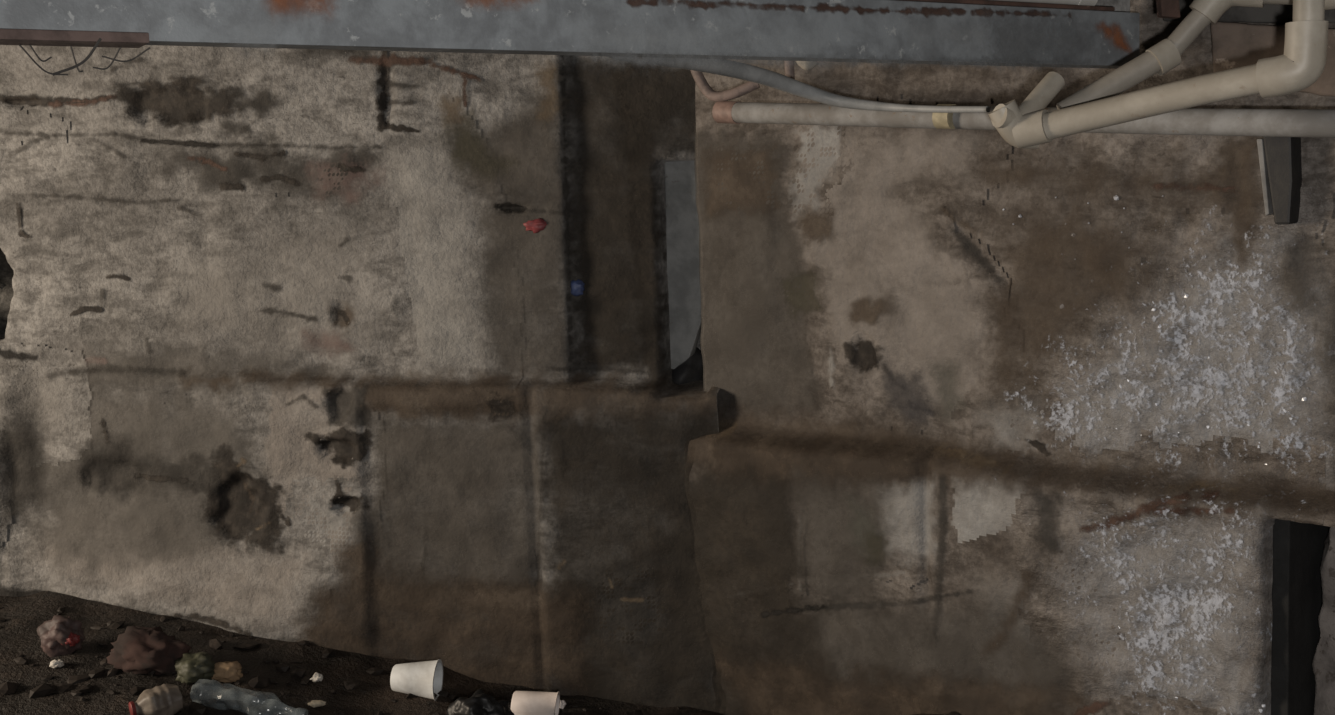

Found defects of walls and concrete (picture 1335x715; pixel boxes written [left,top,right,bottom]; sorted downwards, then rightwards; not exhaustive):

crack [17,132,59,152]
crack [106,51,419,158]
rust [627,0,1051,18]
leakage [0,95,572,563]
leakage [542,58,1335,715]
peeling [2,360,383,642]
leakage [338,421,546,613]